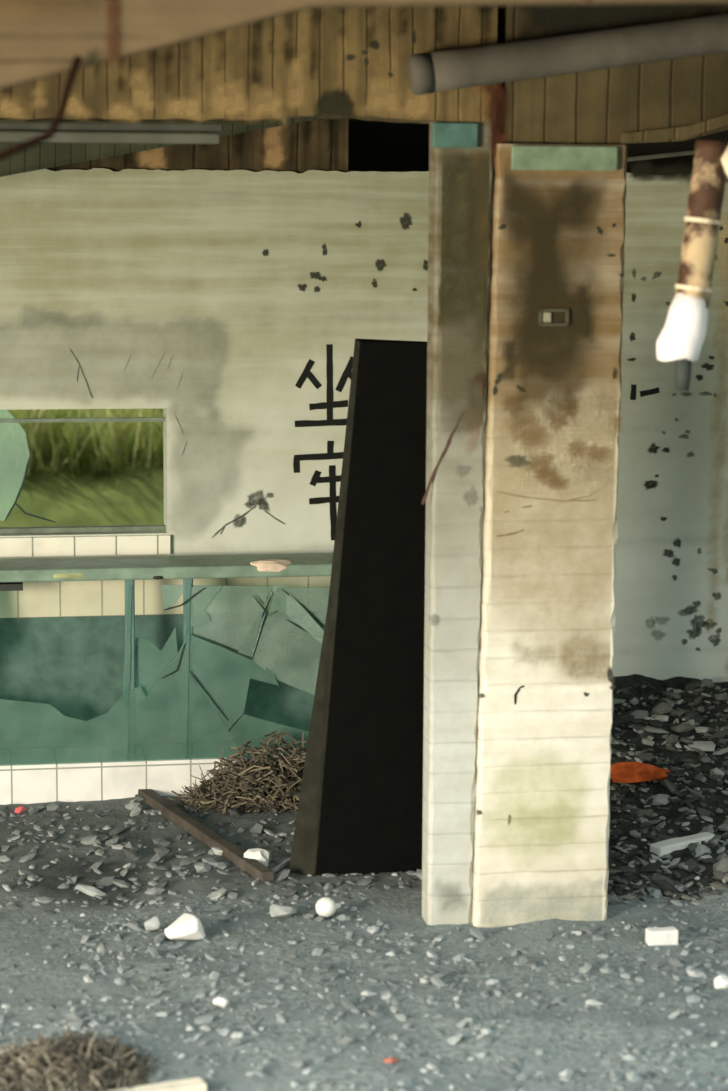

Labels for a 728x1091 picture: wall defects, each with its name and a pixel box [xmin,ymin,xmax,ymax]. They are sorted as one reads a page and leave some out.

spalling [400,213,412,229]
spalling [298,272,327,292]
spalling [372,259,385,288]
leakage [503,182,592,378]
crack [70,349,93,398]
spalling [672,356,717,397]
leakage [507,453,538,466]
crack [212,507,285,538]
spalling [664,539,681,580]
spalling [682,601,722,650]
spalling [607,668,616,690]